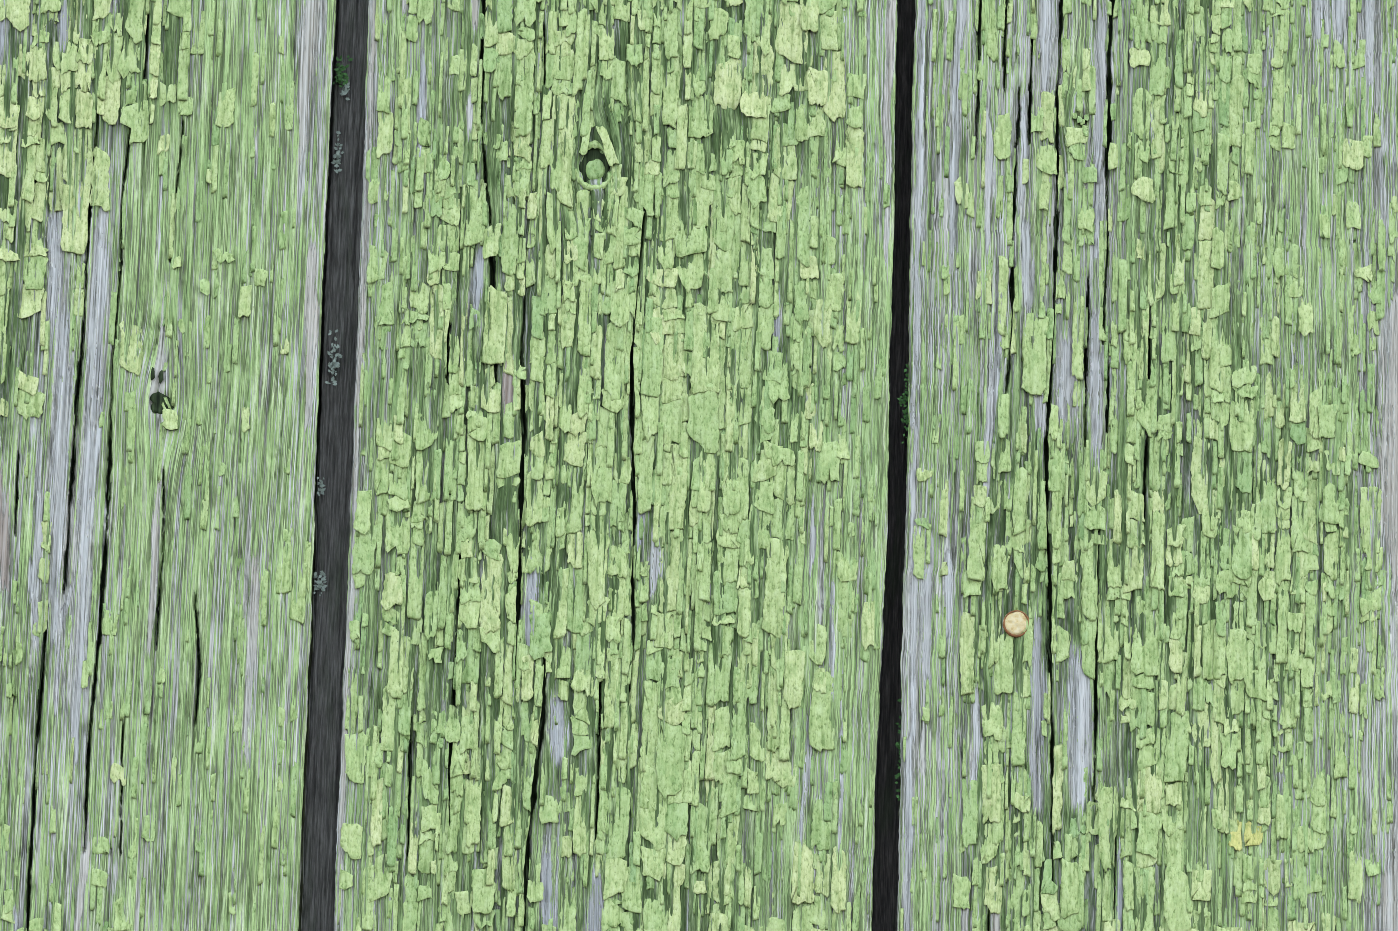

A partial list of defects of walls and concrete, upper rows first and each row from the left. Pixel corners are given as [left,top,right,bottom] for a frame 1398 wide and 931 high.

peeling [0,814,132,931]
peeling [0,0,205,763]
peeling [303,237,319,431]
crack [446,742,454,814]
crack [452,554,461,706]
crack [480,0,546,931]
peeling [336,0,875,931]
crack [595,209,645,840]
peeling [882,0,896,185]
crack [975,0,1115,881]
crack [1141,431,1149,523]
peeling [903,0,1398,931]